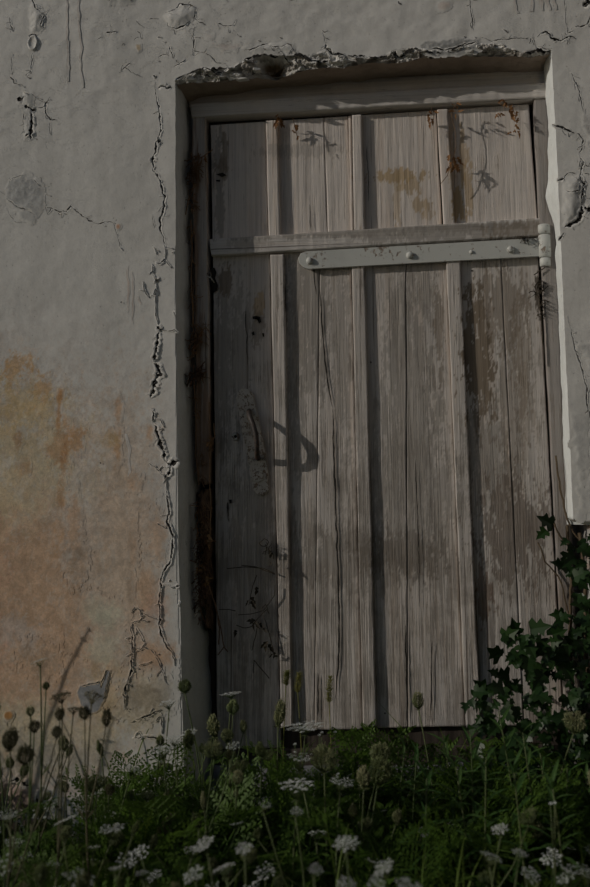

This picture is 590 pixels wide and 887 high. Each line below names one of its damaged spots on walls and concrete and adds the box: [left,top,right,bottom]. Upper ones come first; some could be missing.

crack [31,0,49,28]
crack [9,52,57,140]
spalling [175,35,552,85]
crack [570,72,584,111]
peeling [3,170,47,226]
crack [552,124,590,241]
crack [97,0,297,740]
crack [567,316,590,433]
water stain [0,246,182,856]
spalling [571,519,590,571]